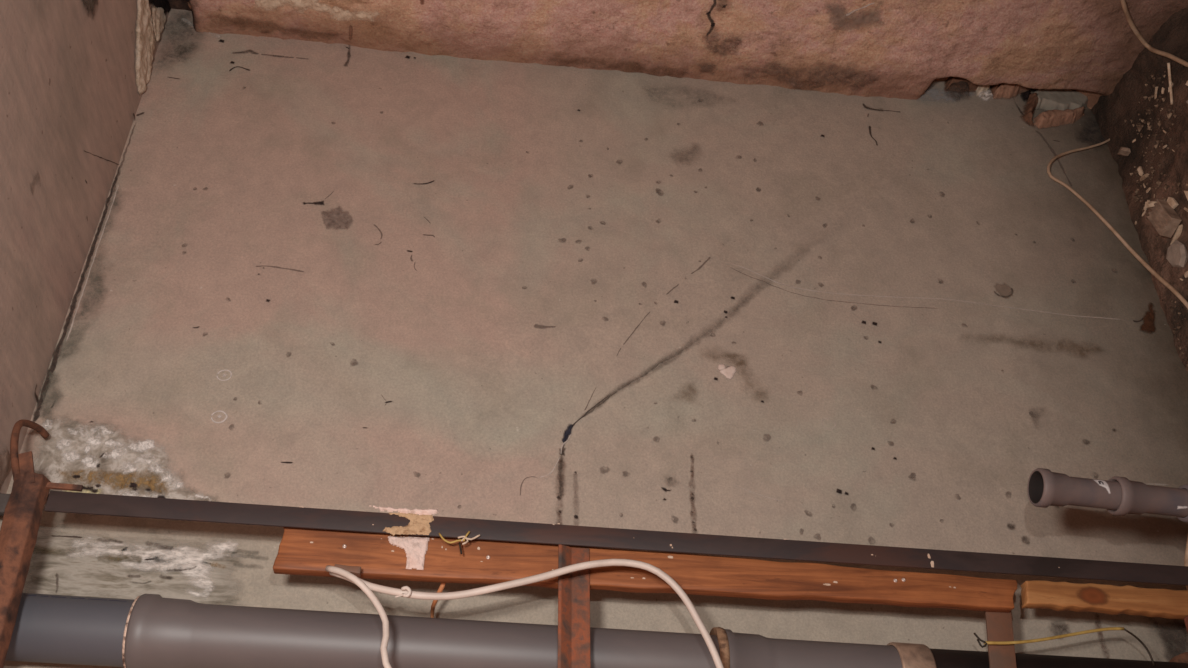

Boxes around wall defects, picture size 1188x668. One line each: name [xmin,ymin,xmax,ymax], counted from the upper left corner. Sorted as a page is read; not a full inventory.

spalling [135,0,166,95]
crack [702,0,741,72]
leakage [33,418,216,501]
leakage [28,527,255,606]
peeling [369,505,439,570]